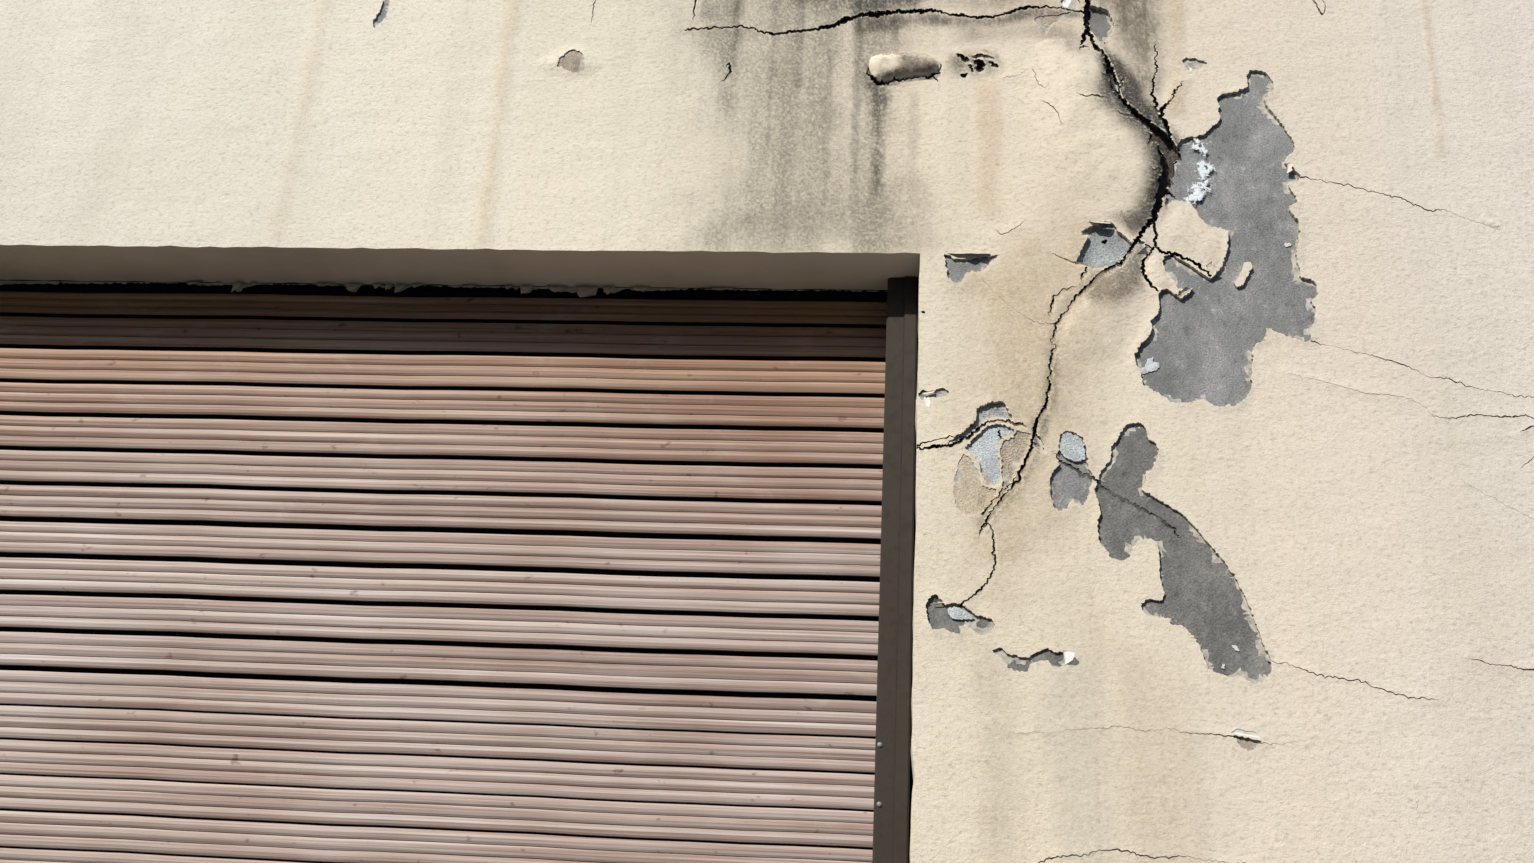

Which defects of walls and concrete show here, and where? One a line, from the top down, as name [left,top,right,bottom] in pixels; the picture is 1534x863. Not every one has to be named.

damp [855,0,965,30]
damp [1113,0,1155,87]
damp [867,69,886,128]
peeling [1076,221,1132,268]
peeling [1134,70,1318,407]
crack [1298,176,1500,230]
crack [684,0,1212,608]
peeling [949,401,1031,515]
peeling [1050,422,1272,684]
peeling [926,594,1075,672]
crack [1273,661,1438,700]
crack [1472,659,1534,671]